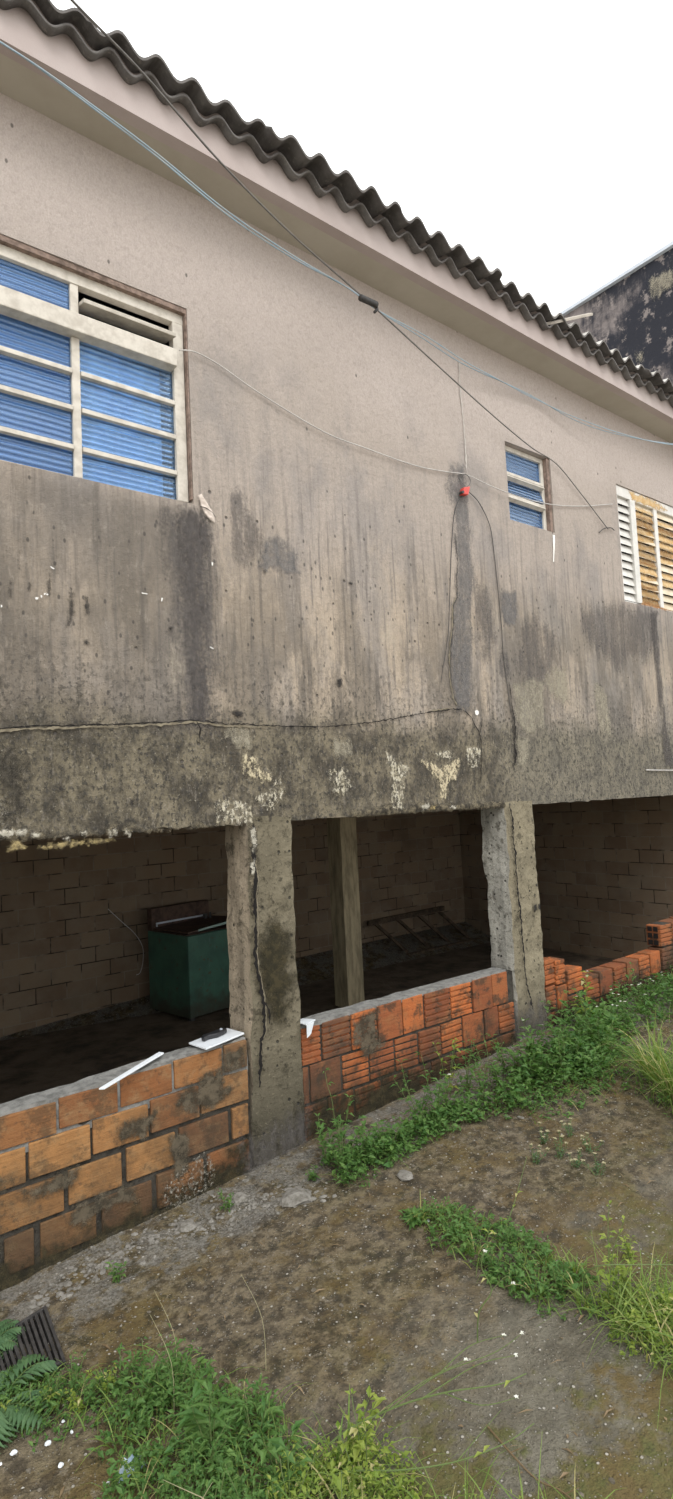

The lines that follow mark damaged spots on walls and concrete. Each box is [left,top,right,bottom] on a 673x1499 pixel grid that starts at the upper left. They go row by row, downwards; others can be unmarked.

damp [179,510,209,721]
crack [0,533,518,782]
damp [330,741,352,796]
damp [386,746,481,809]
damp [450,467,473,710]
damp [650,613,673,767]
crack [251,823,271,1087]
crack [509,804,533,1009]